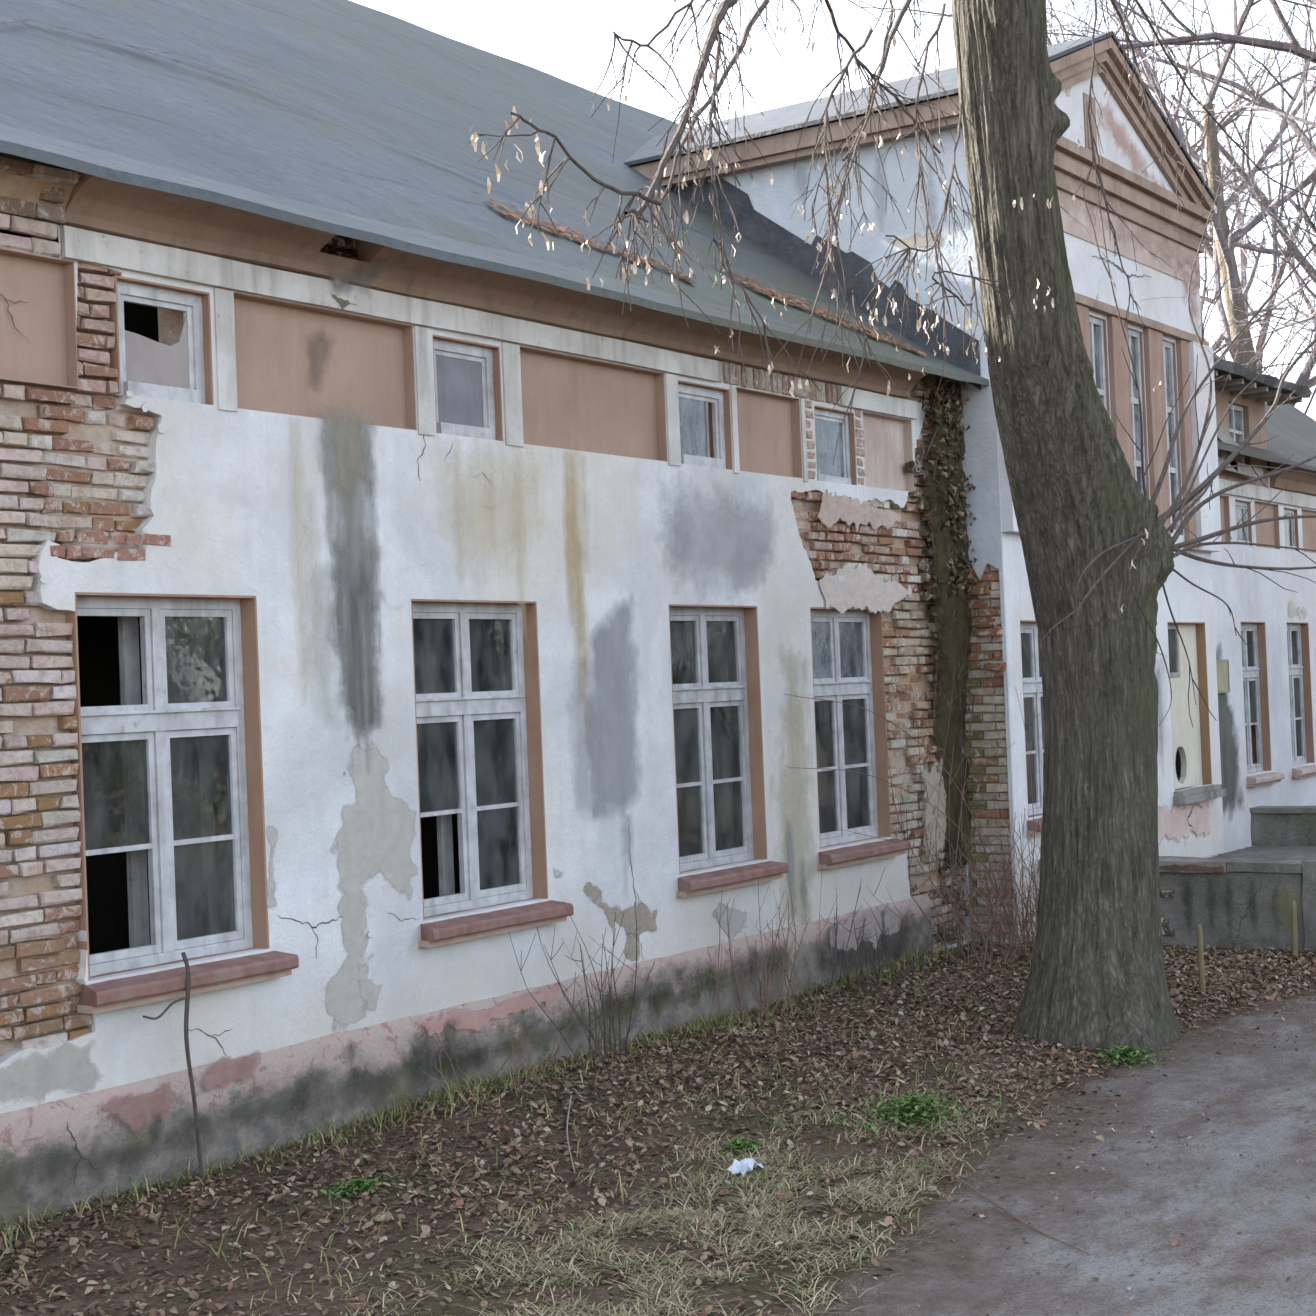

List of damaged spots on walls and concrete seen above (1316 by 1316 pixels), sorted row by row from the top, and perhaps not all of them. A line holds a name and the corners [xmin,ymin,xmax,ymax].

crack [0,294,30,343]
leakage [326,412,378,735]
flaking render [0,261,171,1101]
leakage [578,608,635,809]
flaking render [791,373,1015,951]
leakage [1203,691,1241,811]
peeling [1158,800,1210,845]
crack [278,915,342,959]
peeling [325,745,418,1030]
peeling [584,882,657,961]
peeling [202,1052,261,1091]
leakage [43,1146,76,1178]